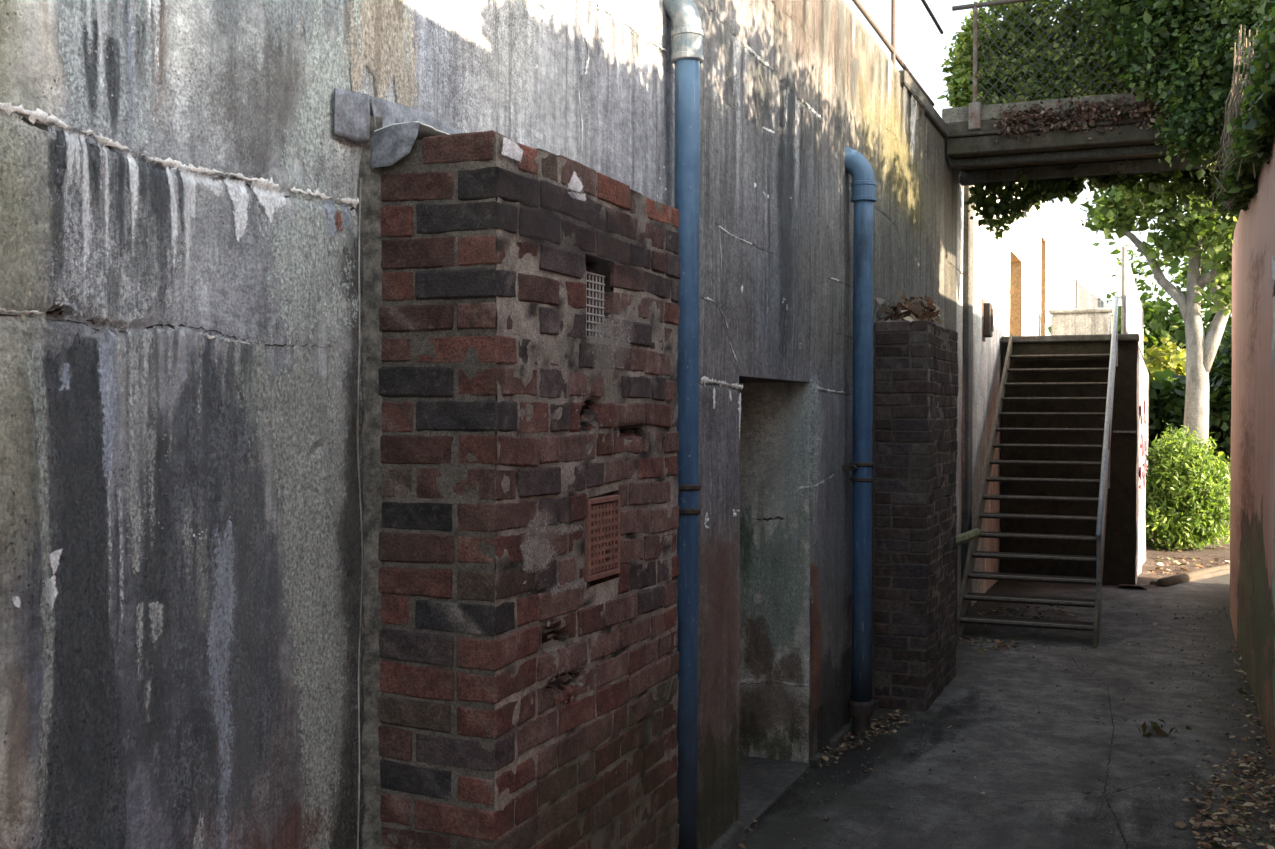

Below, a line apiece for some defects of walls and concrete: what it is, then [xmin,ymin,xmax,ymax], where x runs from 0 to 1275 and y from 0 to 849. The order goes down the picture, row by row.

crack [0,102,359,223]
damp [26,0,418,849]
spalling [574,379,642,436]
damp [733,377,821,685]
crack [955,651,1160,849]